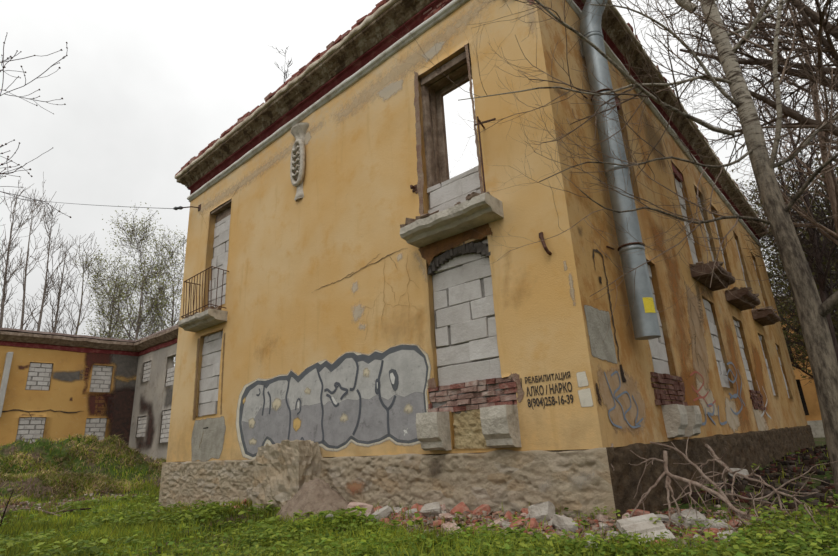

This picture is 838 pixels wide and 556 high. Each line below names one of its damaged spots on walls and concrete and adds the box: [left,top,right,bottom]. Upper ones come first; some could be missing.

crack [312,248,420,320]
crack [2,409,80,421]